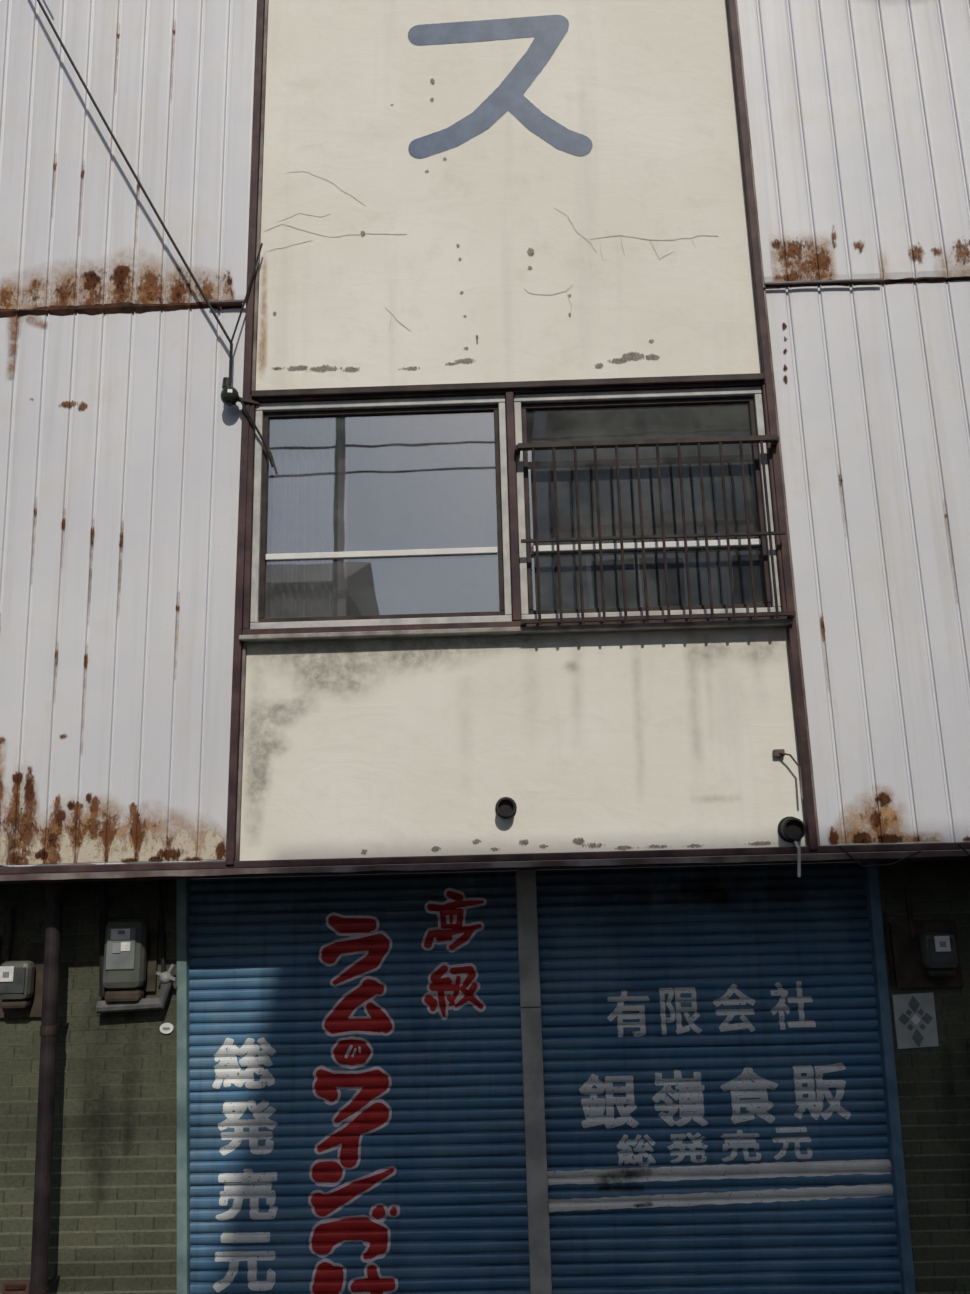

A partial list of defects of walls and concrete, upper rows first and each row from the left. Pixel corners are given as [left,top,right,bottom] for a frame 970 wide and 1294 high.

crack [265,171,407,252]
corrosion [765,231,970,288]
corrosion [0,265,242,371]
peeling [445,335,478,365]
corrosion [0,737,226,865]
corrosion [829,792,937,844]